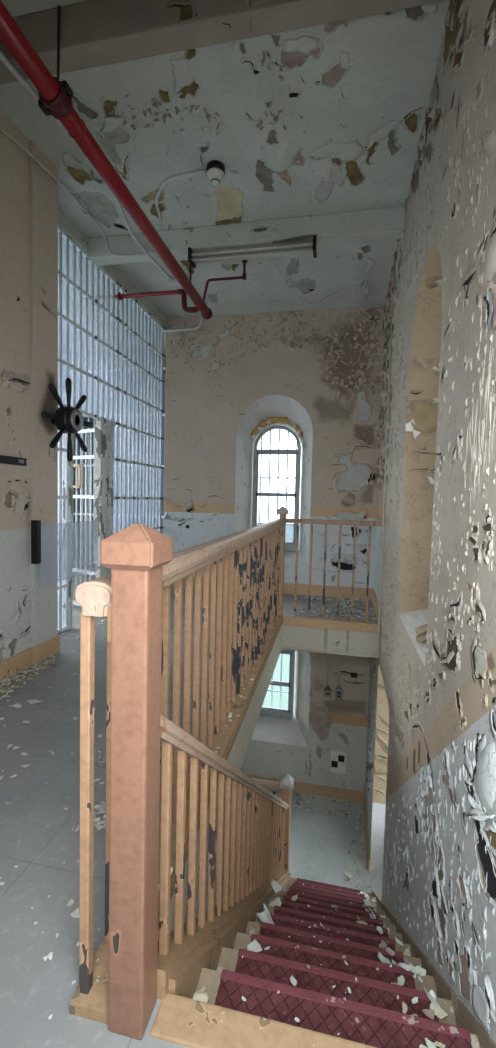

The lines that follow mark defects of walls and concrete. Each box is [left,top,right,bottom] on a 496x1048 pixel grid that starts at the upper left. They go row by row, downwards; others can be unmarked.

peeling [167,0,198,26]
peeling [72,48,224,182]
peeling [231,19,350,134]
peeling [62,152,129,231]
peeling [138,185,195,245]
peeling [203,168,278,238]
leakage [326,311,378,393]
flaking render [0,487,31,521]
peeling [276,0,496,1034]
peeling [0,585,31,664]
peeling [256,879,298,924]
peeling [247,939,270,952]